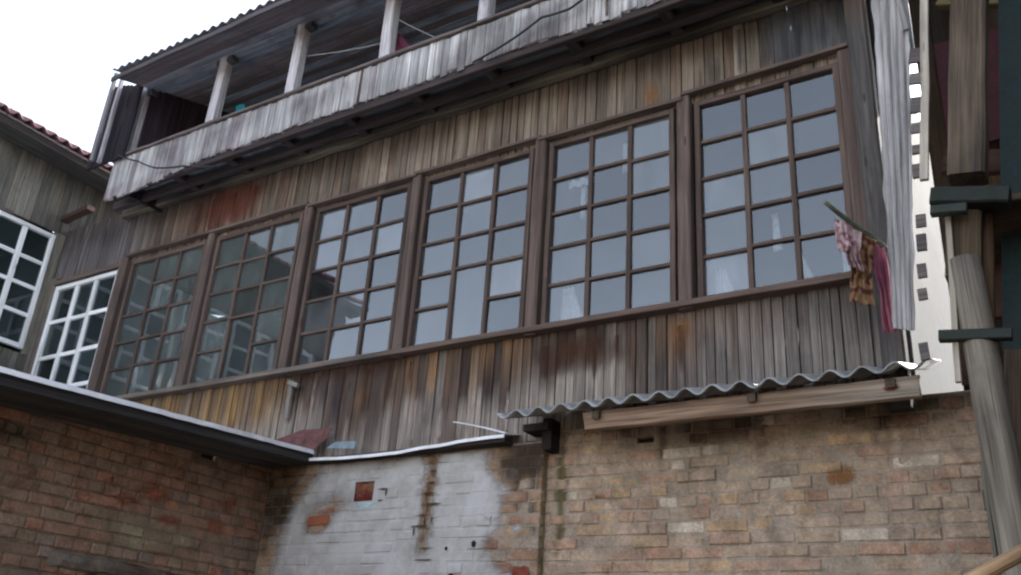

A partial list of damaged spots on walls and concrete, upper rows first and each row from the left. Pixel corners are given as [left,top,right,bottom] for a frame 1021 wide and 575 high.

peeling [274,451,529,575]